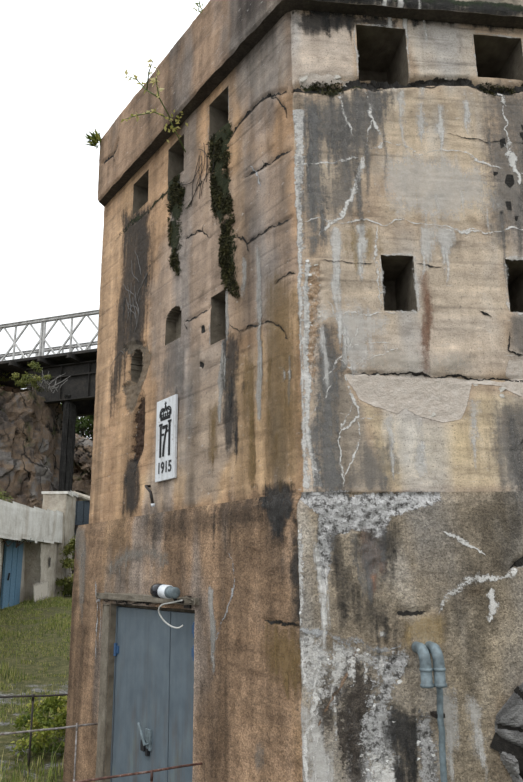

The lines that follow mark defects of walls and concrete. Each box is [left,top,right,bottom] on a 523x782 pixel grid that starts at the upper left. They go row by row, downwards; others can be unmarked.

water stain [110,204,153,414]
crack [119,182,174,236]
spalling [292,109,441,588]
crack [230,79,523,487]
peeling [345,360,523,422]
efflorescence [421,227,455,277]
water stain [487,94,523,267]
water stain [123,459,140,514]
crack [397,531,523,622]
water stain [301,654,420,782]